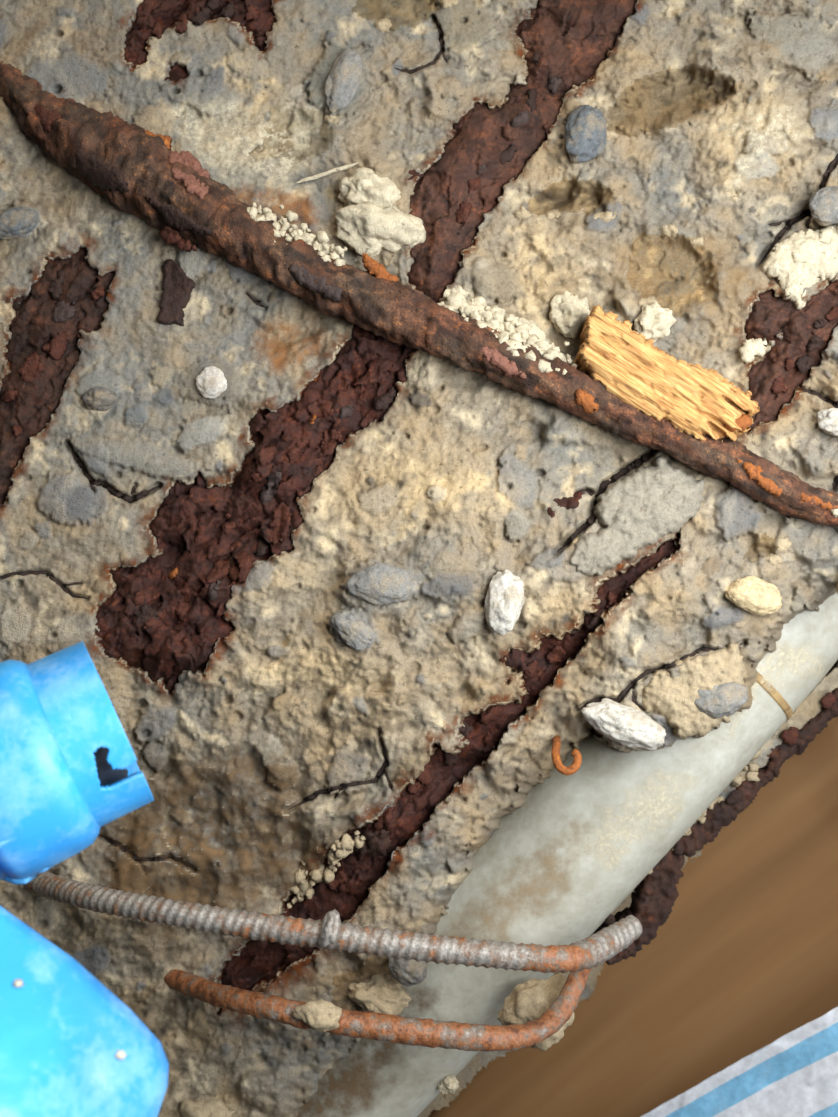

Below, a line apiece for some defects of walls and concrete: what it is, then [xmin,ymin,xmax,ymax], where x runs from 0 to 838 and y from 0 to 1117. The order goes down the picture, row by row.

corrosion [0,0,838,695]
crack [68,443,159,503]
crack [0,570,88,599]
crack [578,642,745,713]
corrosion [282,533,682,923]
crack [288,731,393,810]
corrosion [210,938,320,993]
spalling [24,872,643,1052]